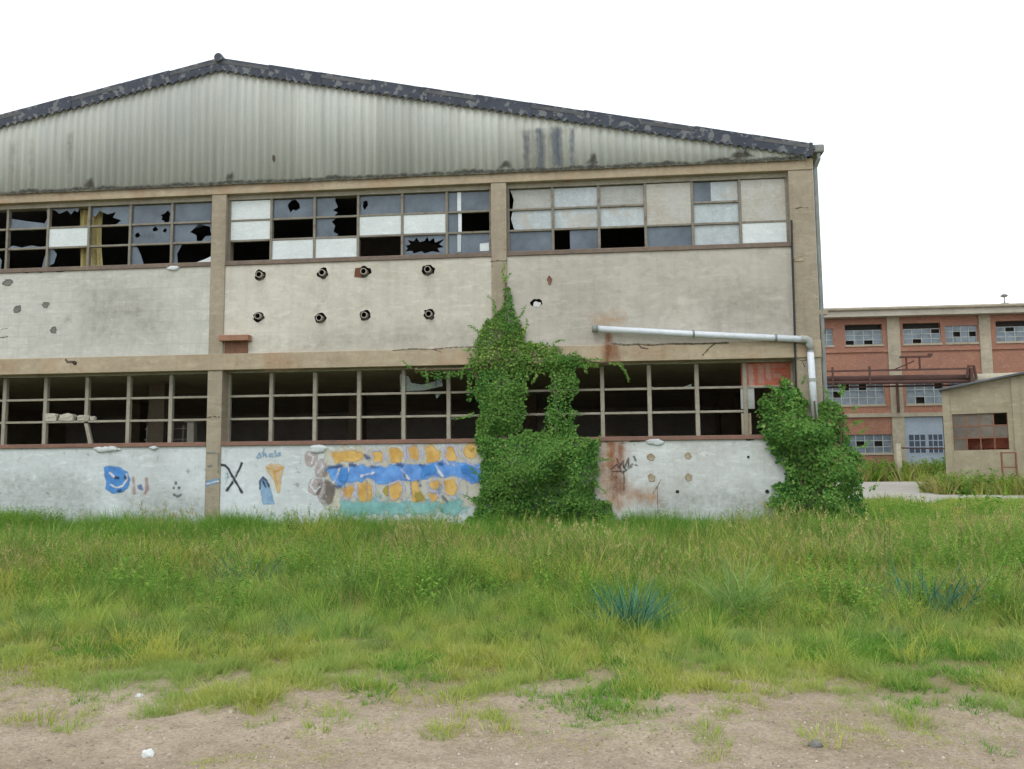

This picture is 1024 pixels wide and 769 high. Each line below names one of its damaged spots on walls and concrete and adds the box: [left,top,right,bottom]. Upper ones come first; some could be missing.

damp [11,128,802,194]